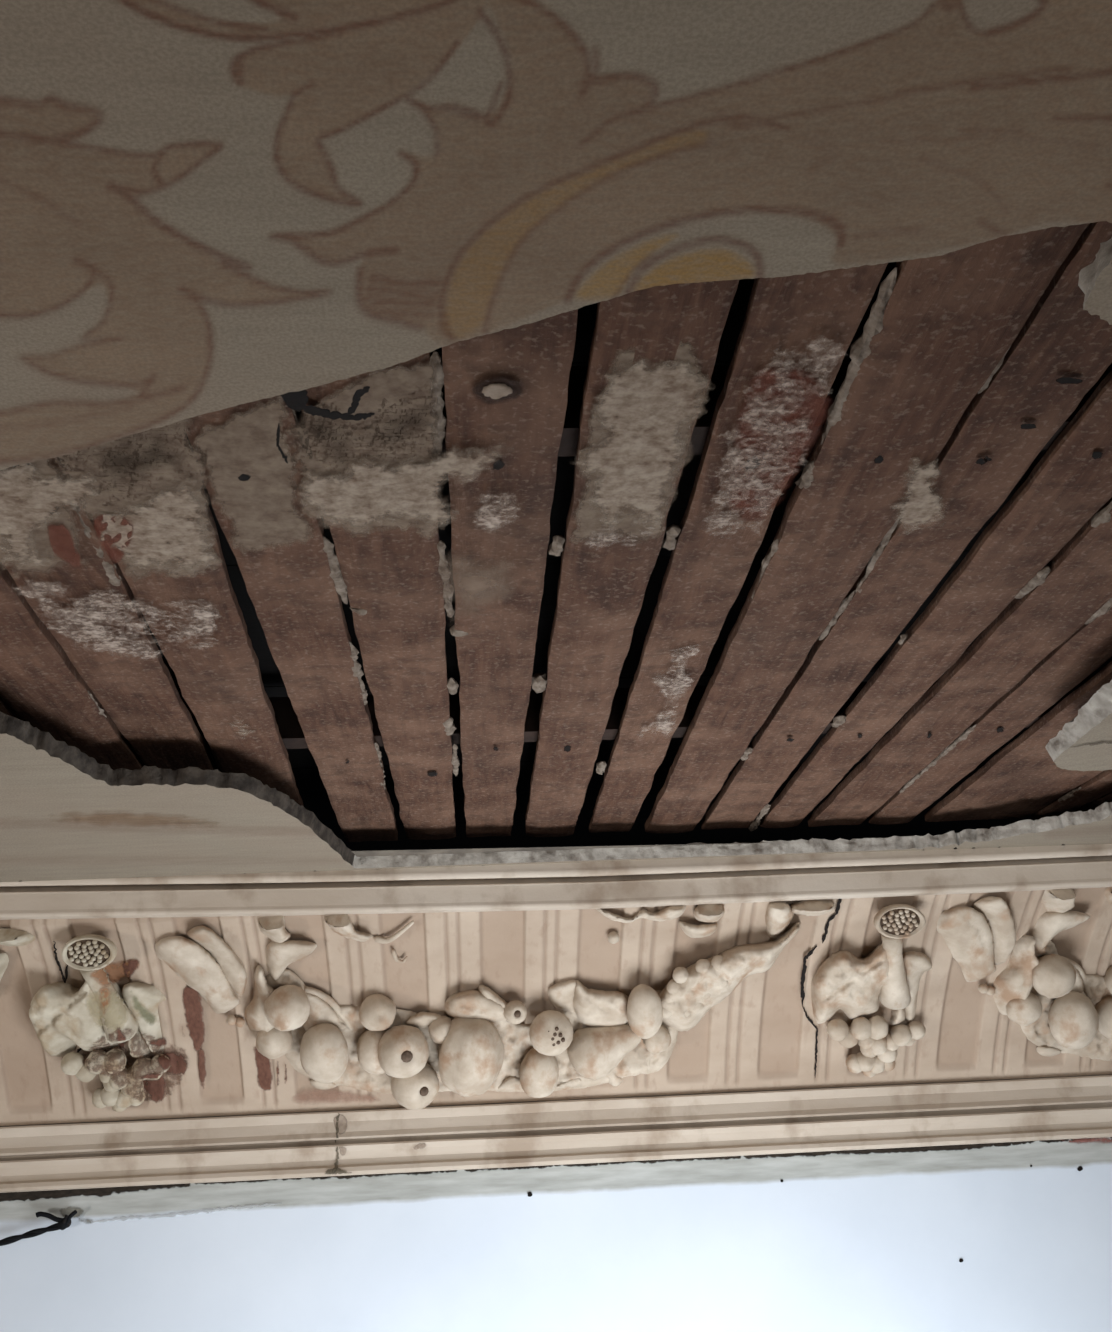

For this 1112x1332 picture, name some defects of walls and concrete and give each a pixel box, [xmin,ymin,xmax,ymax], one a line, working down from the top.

spalling [1078,237,1112,310]
peeling [48,524,80,567]
peeling [94,515,133,562]
spalling [1045,680,1112,762]
spalling [0,712,1112,868]
crack [800,899,842,1075]